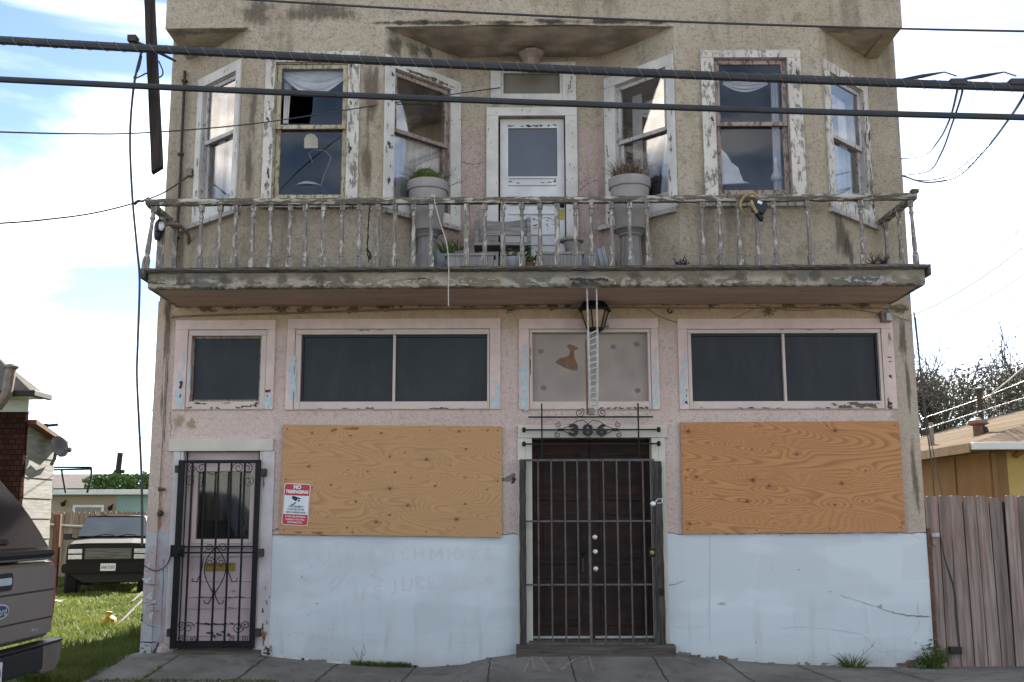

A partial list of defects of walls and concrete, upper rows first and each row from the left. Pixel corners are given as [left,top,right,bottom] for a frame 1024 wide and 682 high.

crack [365,206,373,262]
peeling [174,350,272,410]
peeling [816,398,893,409]
crack [772,595,930,662]